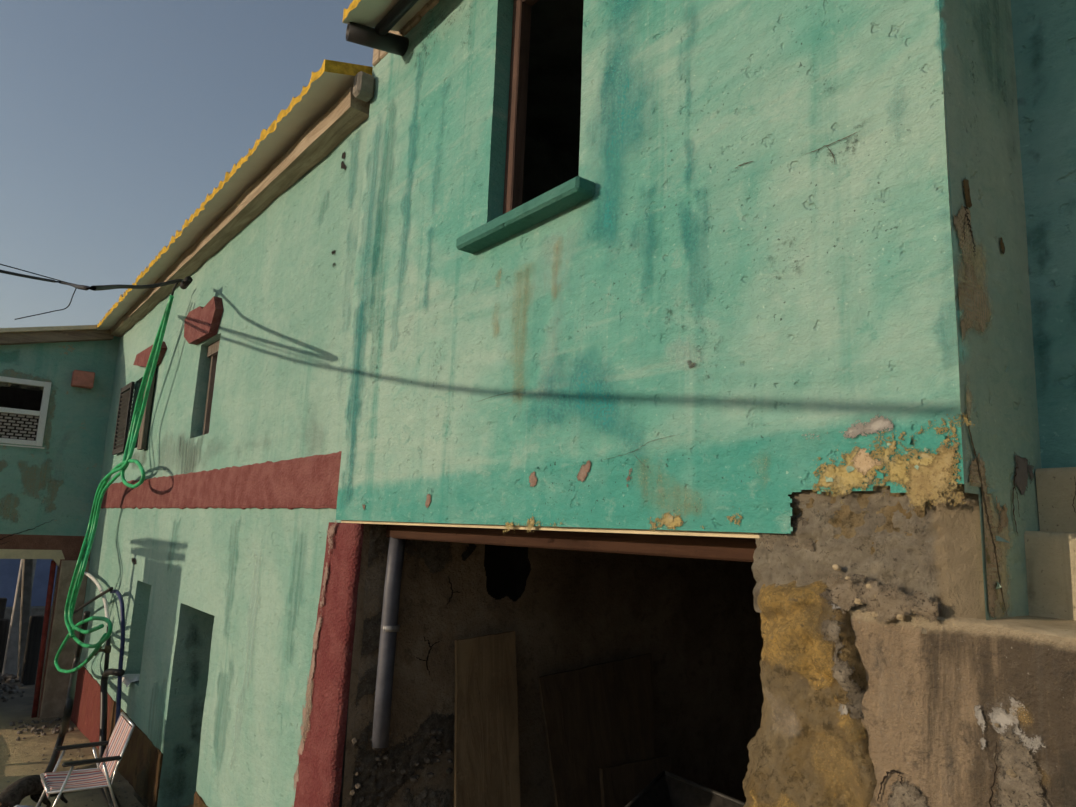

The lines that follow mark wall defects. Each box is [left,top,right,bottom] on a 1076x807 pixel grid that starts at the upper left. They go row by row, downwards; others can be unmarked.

peeling [953,179,990,354]
spalling [368,524,389,567]
spalling [405,539,532,602]
spalling [577,460,591,482]
peeling [648,510,683,532]
spalling [755,516,815,552]
peeling [812,413,1010,618]
peeling [292,520,337,807]
spalling [361,605,383,657]
spalling [819,564,939,722]
spalling [350,668,455,807]
spalling [974,697,1051,807]